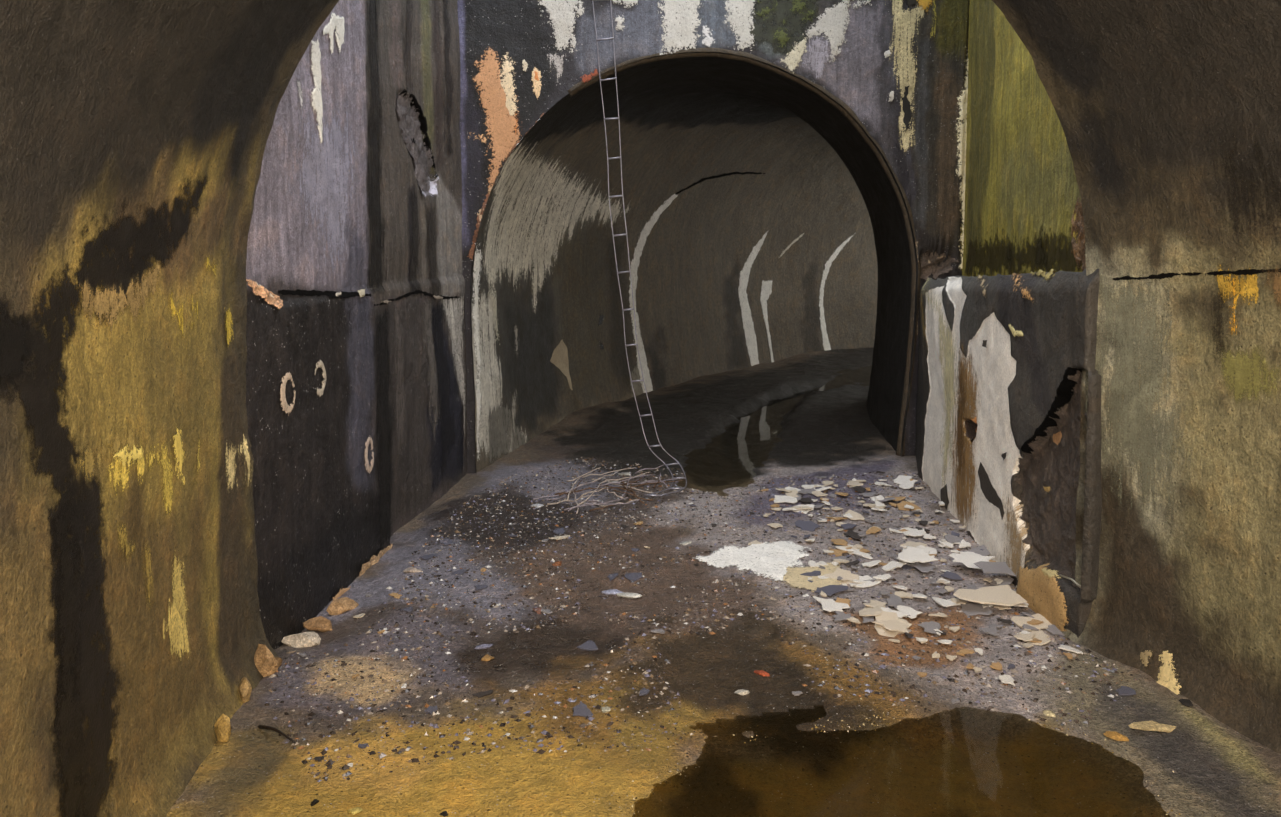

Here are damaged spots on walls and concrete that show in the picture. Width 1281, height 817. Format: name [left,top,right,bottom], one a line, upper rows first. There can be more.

water stain [538,0,584,78]
water stain [613,0,638,31]
water stain [658,0,755,55]
spalling [395,89,439,197]
rust [468,48,542,193]
spalling [467,113,544,260]
water stain [955,46,1083,277]
crack [1113,268,1281,280]
water stain [0,177,208,817]
peeling [763,250,1087,685]